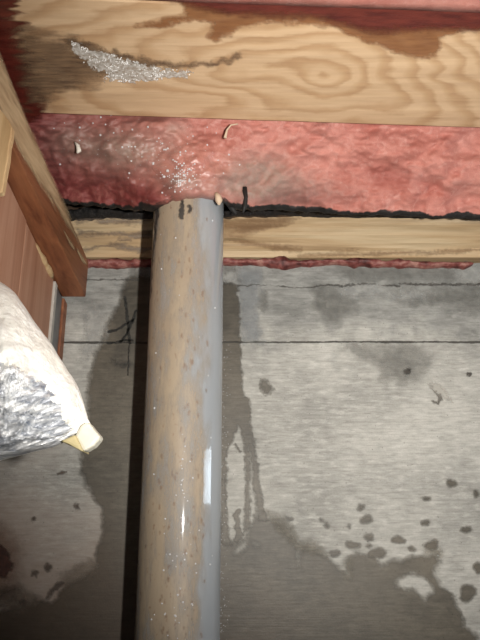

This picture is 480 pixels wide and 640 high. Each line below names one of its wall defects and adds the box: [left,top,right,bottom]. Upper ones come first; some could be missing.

damp [0,0,240,123]
damp [145,2,480,57]
damp [0,268,151,640]
damp [220,266,480,640]